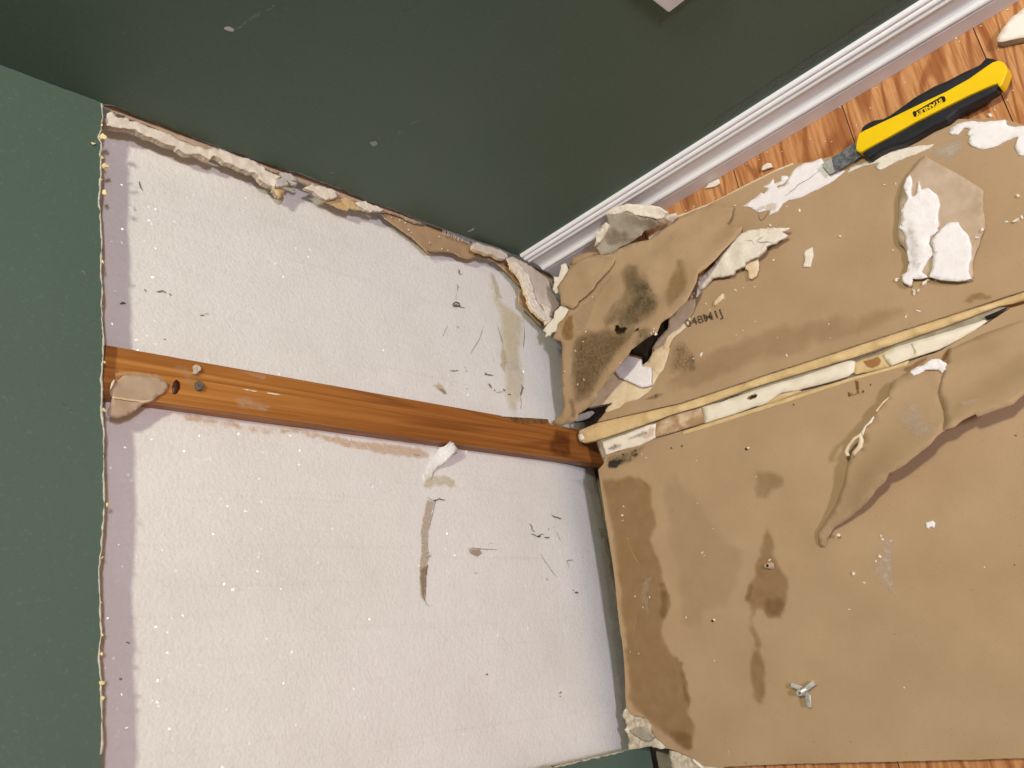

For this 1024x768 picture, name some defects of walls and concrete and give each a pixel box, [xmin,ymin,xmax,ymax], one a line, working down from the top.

spalling [275,172,337,202]
spalling [354,201,384,213]
spalling [420,498,444,607]